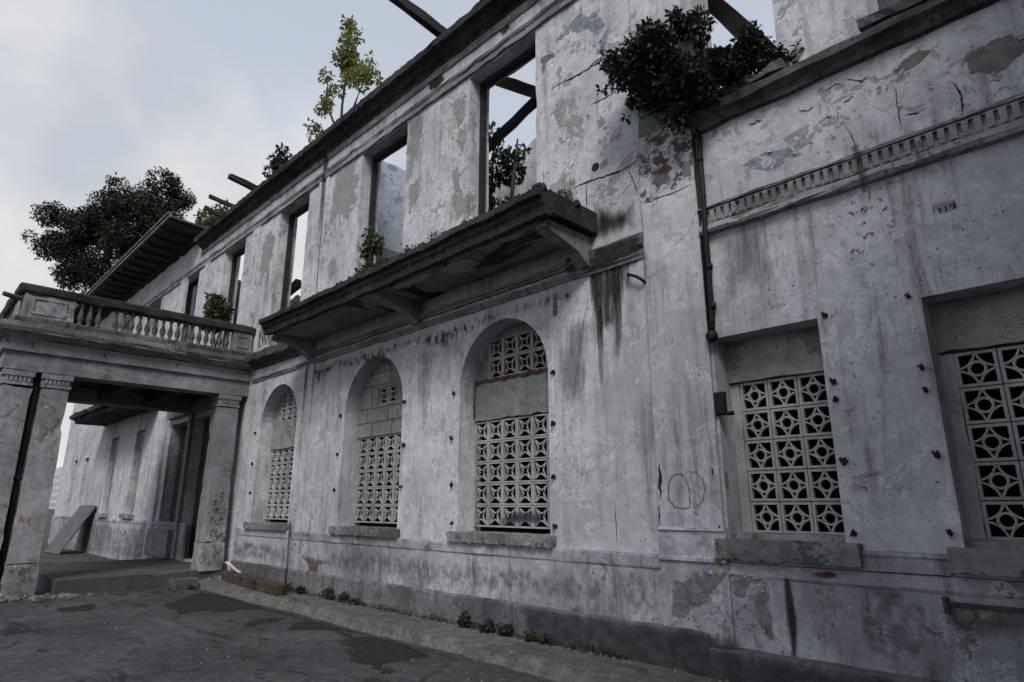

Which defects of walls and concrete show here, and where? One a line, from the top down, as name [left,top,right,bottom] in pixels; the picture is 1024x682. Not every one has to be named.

peeling [540,8,609,73]
crack [553,53,612,88]
peeling [963,31,1024,78]
peeling [328,156,359,237]
peeling [550,97,607,144]
crack [572,159,691,206]
peeling [636,108,695,202]
peeling [744,112,850,170]
water stain [583,211,639,349]
water stain [315,325,473,381]
spalling [667,568,773,639]